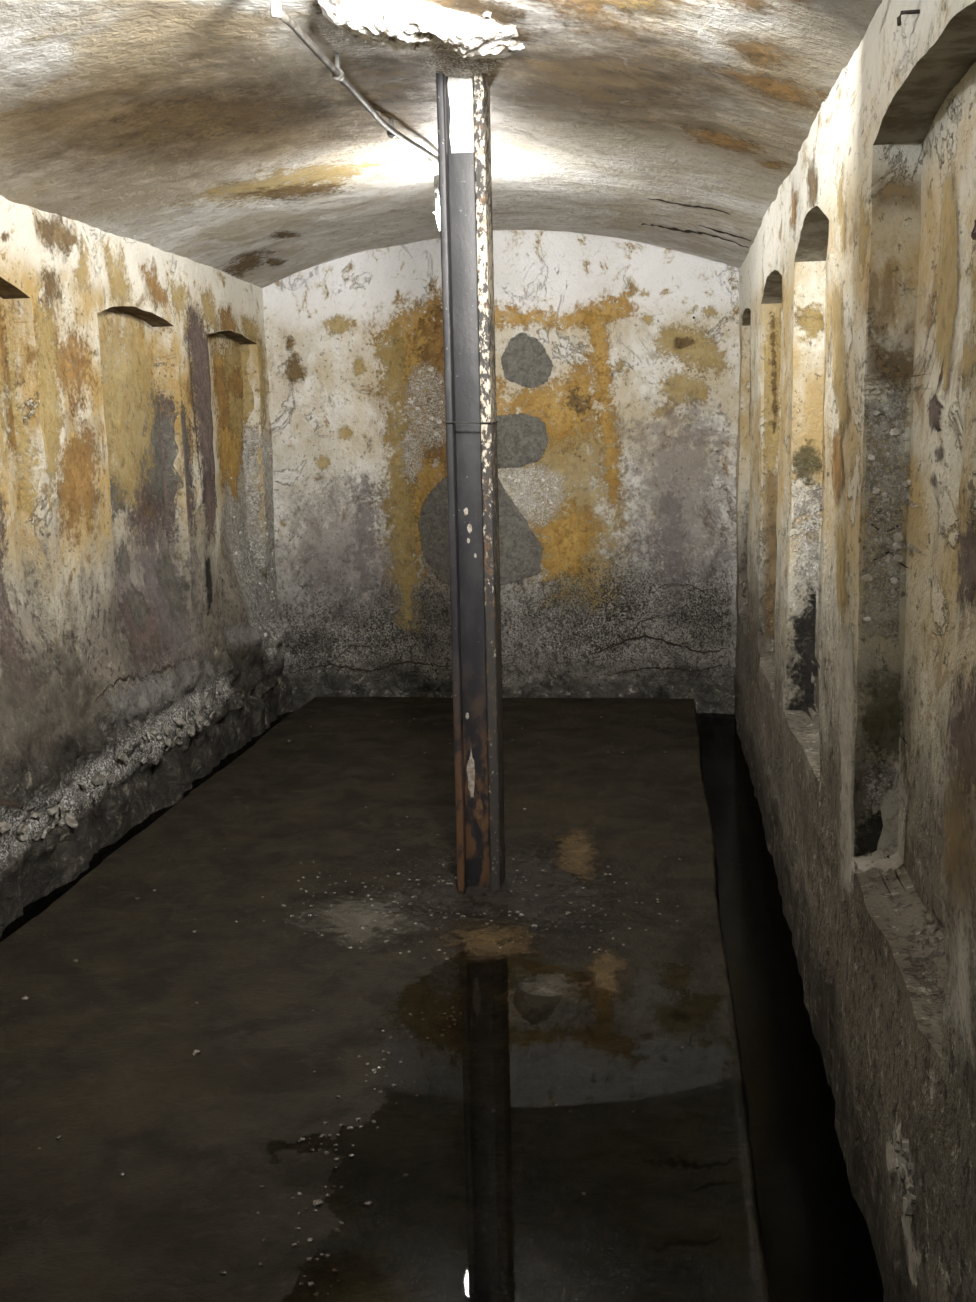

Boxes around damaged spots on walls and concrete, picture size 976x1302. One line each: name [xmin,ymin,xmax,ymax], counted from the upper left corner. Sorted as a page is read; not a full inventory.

flaking render [306,0,544,80]
leakage [485,28,732,118]
leakage [0,492,101,763]
leakage [117,552,195,673]
leakage [221,421,452,699]
leakage [501,550,735,694]
leakage [957,489,976,625]
flaking render [0,662,237,866]